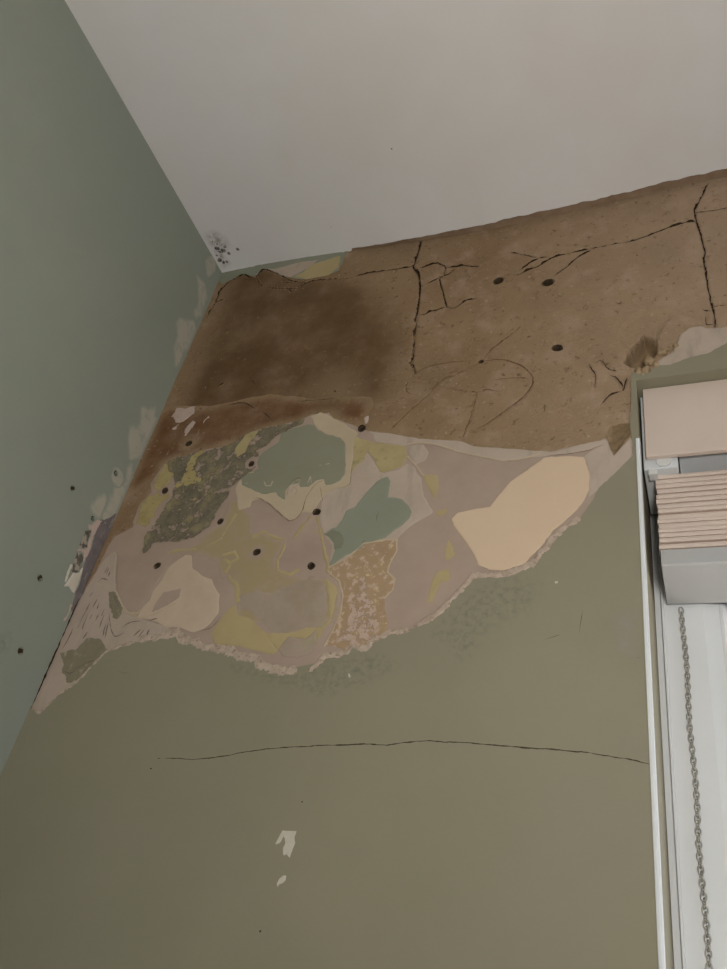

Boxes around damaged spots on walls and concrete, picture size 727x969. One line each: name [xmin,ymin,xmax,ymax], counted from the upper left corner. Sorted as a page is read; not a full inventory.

crack [513,184,724,327]
water stain [84,229,427,591]
peeling [32,169,727,714]
crack [589,360,627,403]
crack [157,740,649,764]
peeling [276,831,296,858]